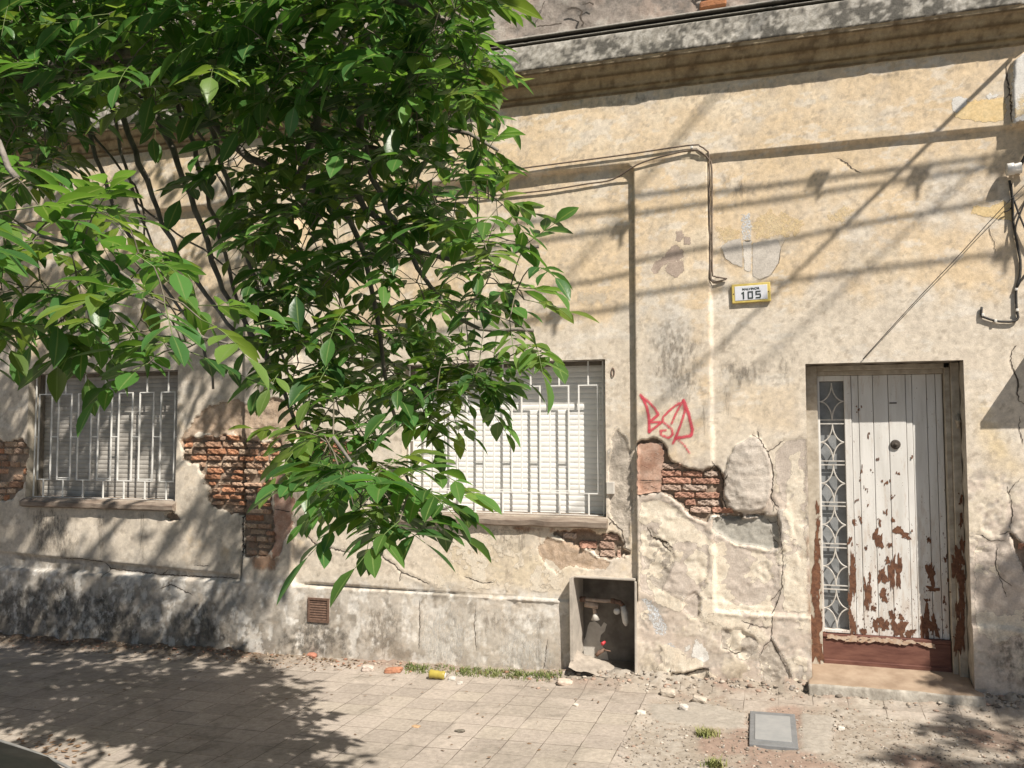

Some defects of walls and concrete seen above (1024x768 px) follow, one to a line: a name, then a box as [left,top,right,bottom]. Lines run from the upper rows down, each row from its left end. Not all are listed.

peeling [651,231,691,277]
peeling [716,209,803,279]
crack [1010,345,1024,443]
flaking render [0,438,30,501]
flaking render [179,397,303,558]
peeling [446,426,1024,682]
crack [725,431,789,675]
crack [978,479,1020,597]
damp [0,586,138,635]